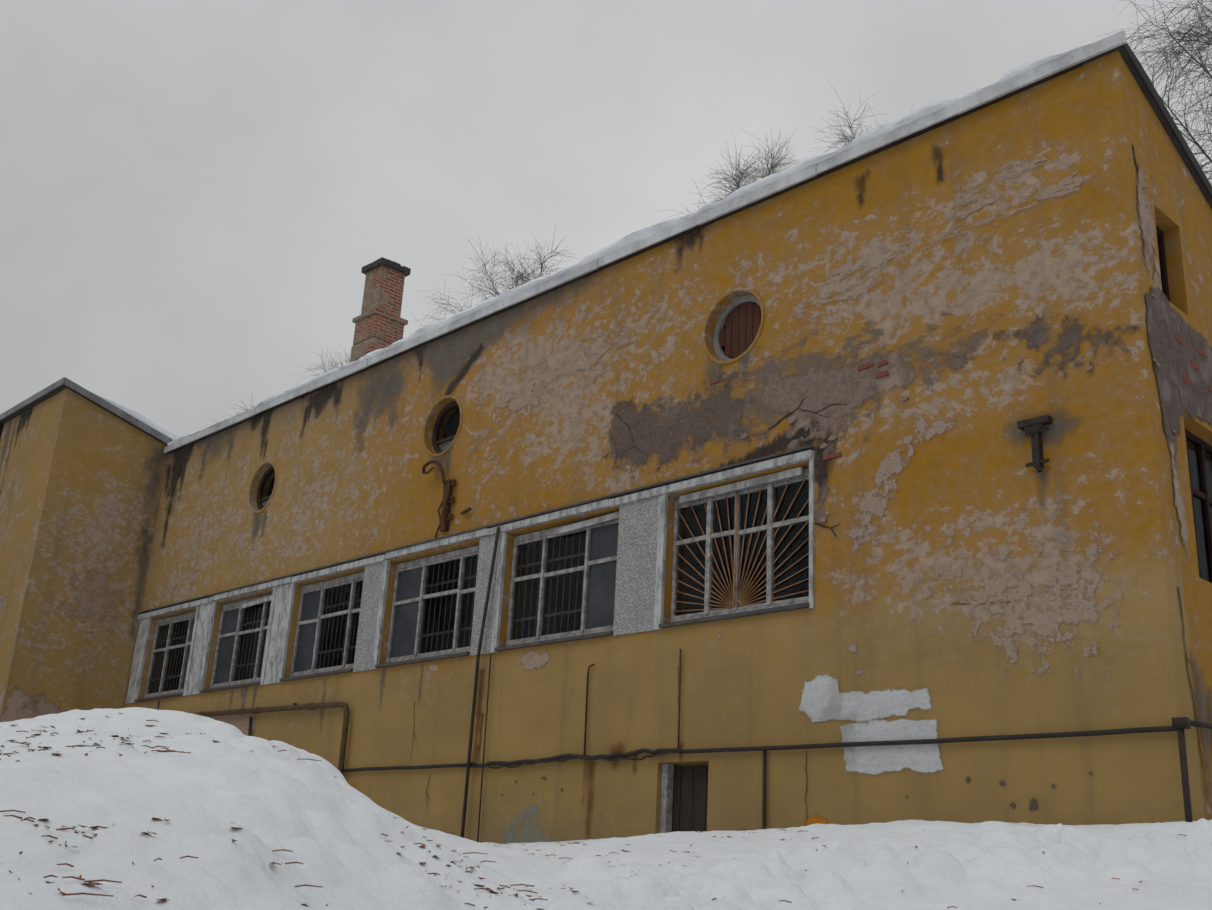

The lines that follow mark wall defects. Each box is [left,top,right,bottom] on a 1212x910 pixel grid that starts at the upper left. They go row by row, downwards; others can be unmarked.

flaking render [601,140,1212,557]